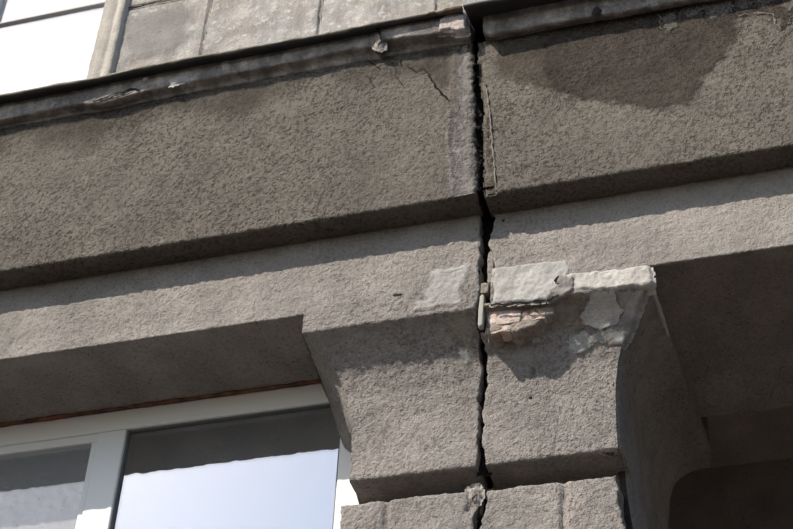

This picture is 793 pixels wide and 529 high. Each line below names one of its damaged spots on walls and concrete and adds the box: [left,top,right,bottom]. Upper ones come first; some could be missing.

spalling [372,28,387,52]
damp [496,0,793,110]
crack [366,60,450,102]
peeling [413,265,469,310]
crack [473,33,495,529]
spalling [483,266,672,351]
spalling [464,483,485,506]